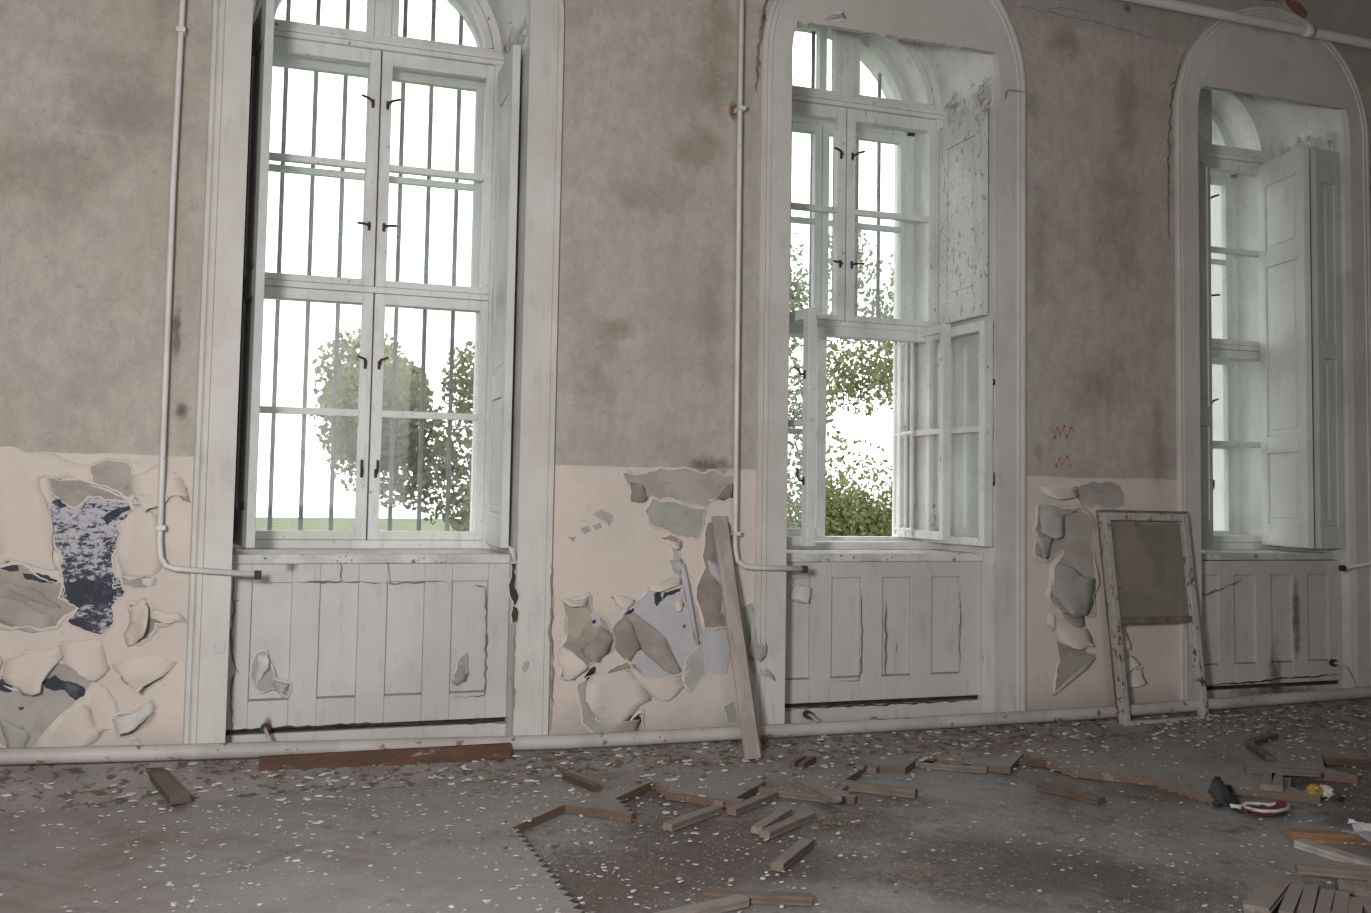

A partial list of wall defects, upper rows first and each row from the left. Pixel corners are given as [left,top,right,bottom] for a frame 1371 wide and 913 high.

crack [1001,1,1189,238]
peeling [0,446,192,748]
peeling [249,649,293,699]
peeling [555,466,775,733]
peeling [1032,479,1125,697]
peeling [1118,521,1167,687]